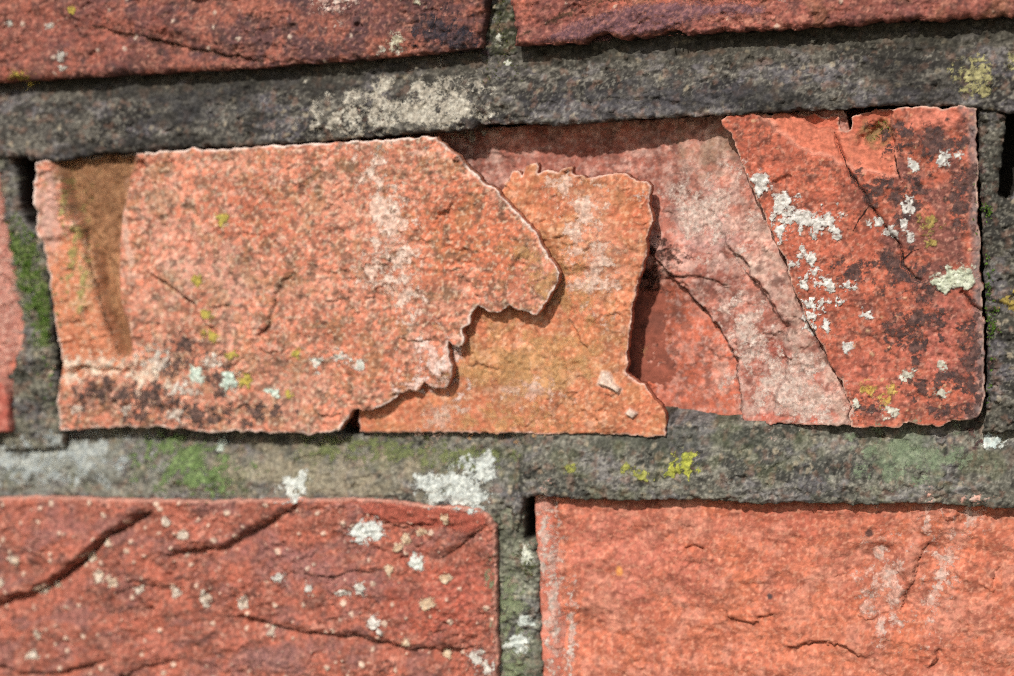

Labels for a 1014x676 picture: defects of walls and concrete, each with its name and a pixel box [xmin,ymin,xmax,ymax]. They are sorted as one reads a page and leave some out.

water stain [26,249,174,395]
peeling [33,105,986,438]
crack [836,137,977,308]